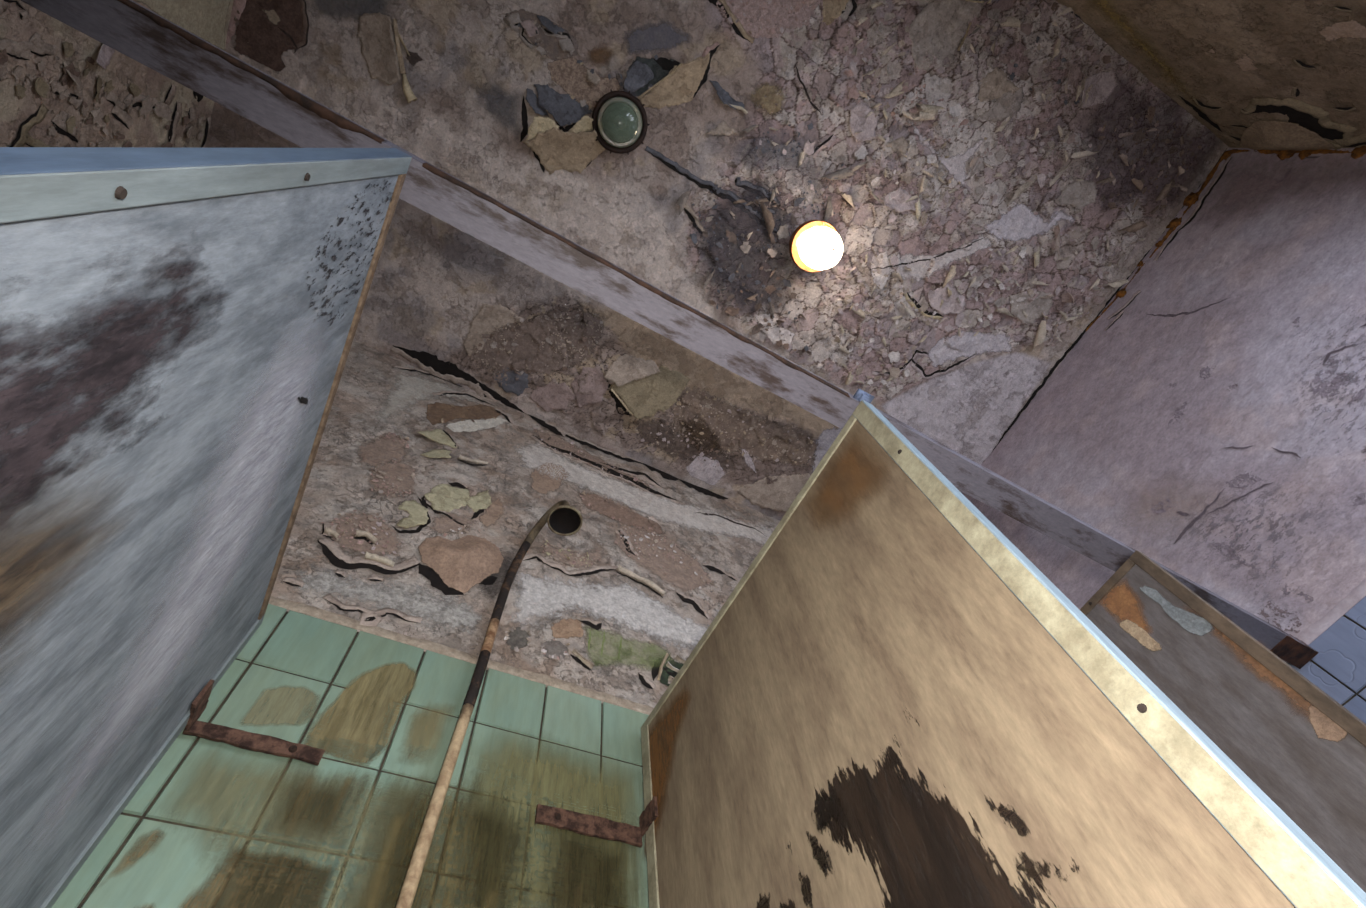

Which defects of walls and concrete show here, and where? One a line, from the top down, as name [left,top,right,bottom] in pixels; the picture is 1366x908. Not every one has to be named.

spalling [137,0,309,74]
crack [795,65,835,158]
peeling [503,0,1203,392]
crack [904,292,944,320]
spalling [378,374,507,466]
peeling [463,303,842,512]
crack [872,350,981,379]
flaking render [516,428,773,544]
peeling [299,482,504,633]
flaking render [504,539,709,686]
leakage [243,663,440,765]
leakage [181,745,636,908]